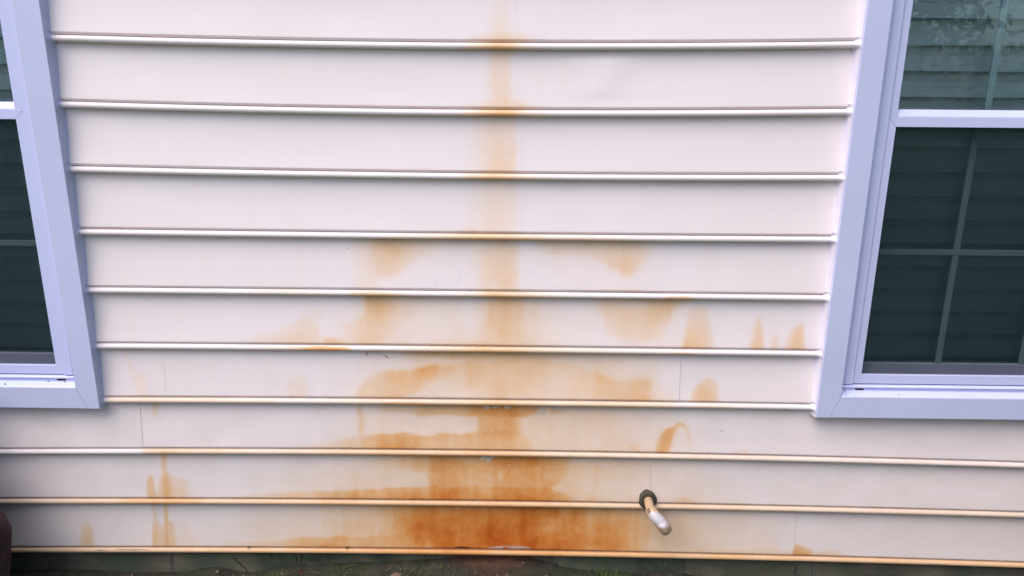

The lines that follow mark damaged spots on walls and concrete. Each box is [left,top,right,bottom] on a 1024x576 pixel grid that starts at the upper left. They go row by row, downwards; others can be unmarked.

corrosion [462,0,544,42]
corrosion [240,42,725,355]
corrosion [744,312,811,350]
corrosion [0,345,1024,568]